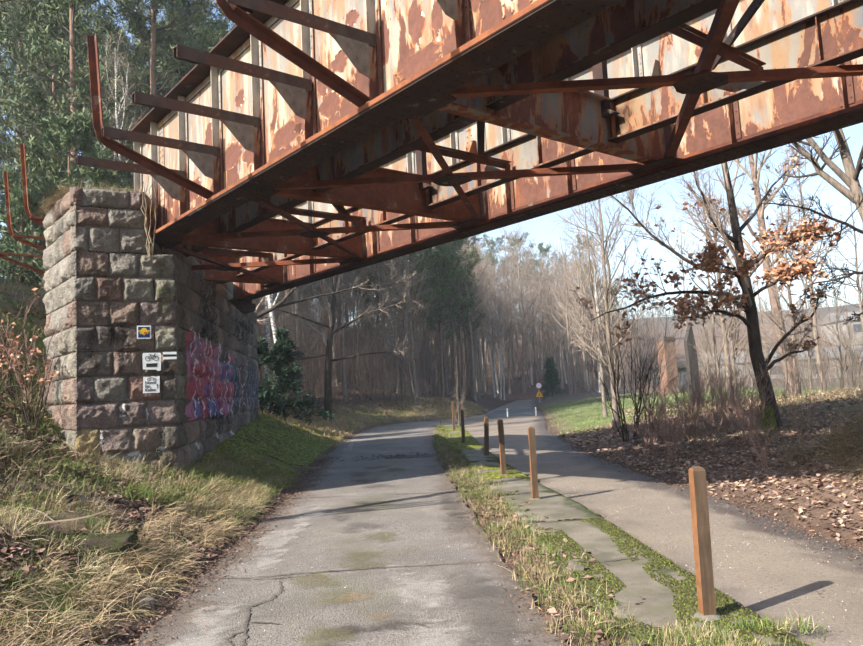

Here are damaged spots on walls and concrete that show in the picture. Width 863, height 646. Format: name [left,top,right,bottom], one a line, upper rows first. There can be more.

peeling [345,8,359,27]
peeling [380,10,390,68]
peeling [395,0,443,81]
peeling [330,49,348,73]
peeling [235,88,245,108]
peeling [318,80,342,120]
peeling [223,141,254,172]
peeling [189,177,202,203]
crack [177,561,488,646]